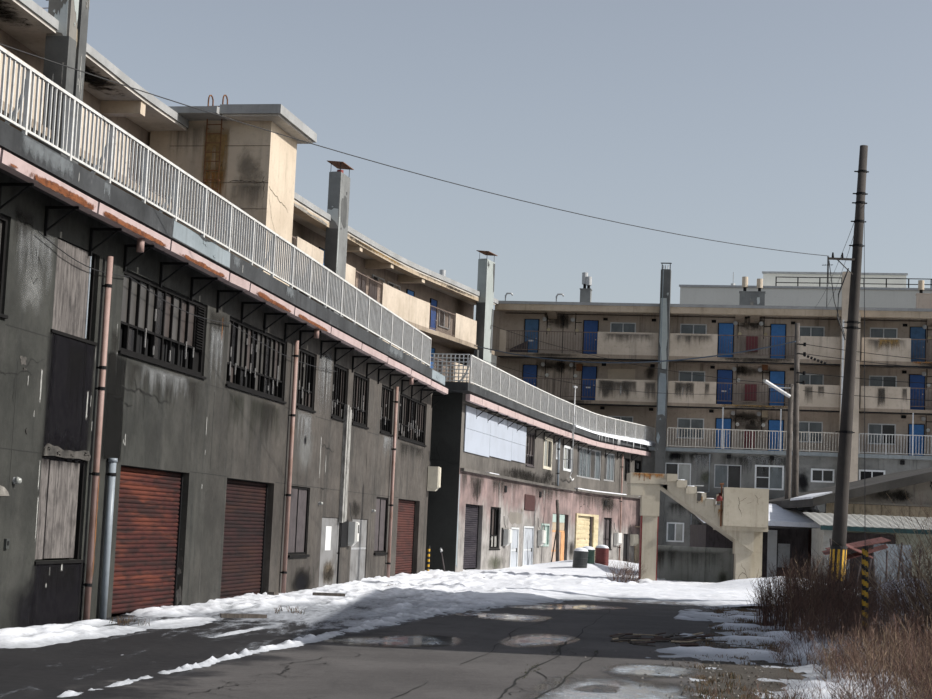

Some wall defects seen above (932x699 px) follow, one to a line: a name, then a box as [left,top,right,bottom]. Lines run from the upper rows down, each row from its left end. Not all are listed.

rust [203,132,228,201]
rust [31,173,94,210]
rust [104,211,166,246]
rust [183,254,225,277]